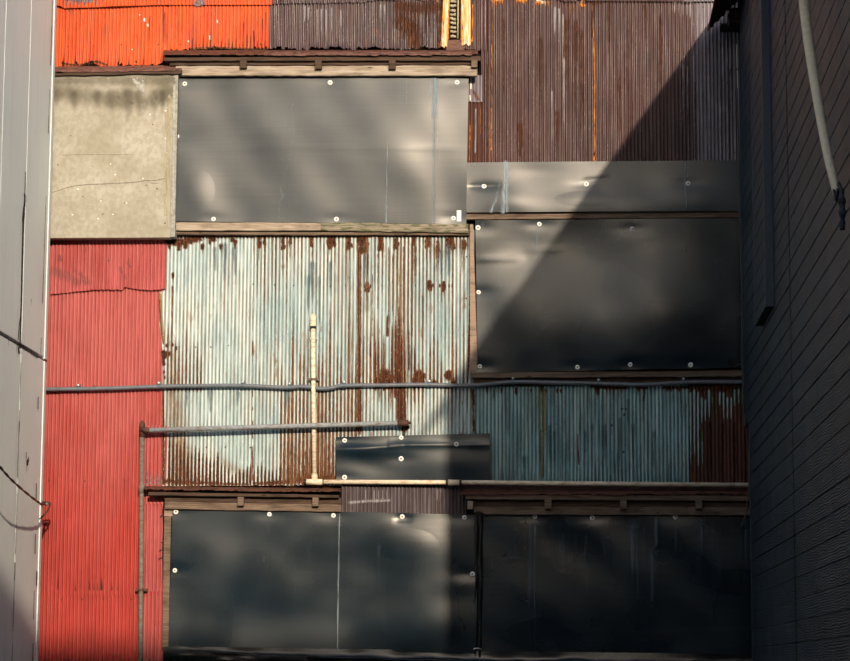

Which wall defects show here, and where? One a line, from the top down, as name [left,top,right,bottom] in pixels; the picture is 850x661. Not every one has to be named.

leakage [54,77,171,228]
corrosion [567,0,610,161]
crack [18,172,165,348]
crack [17,397,39,500]
corrosion [159,232,475,487]
corrosion [590,385,742,398]
crack [12,505,38,661]